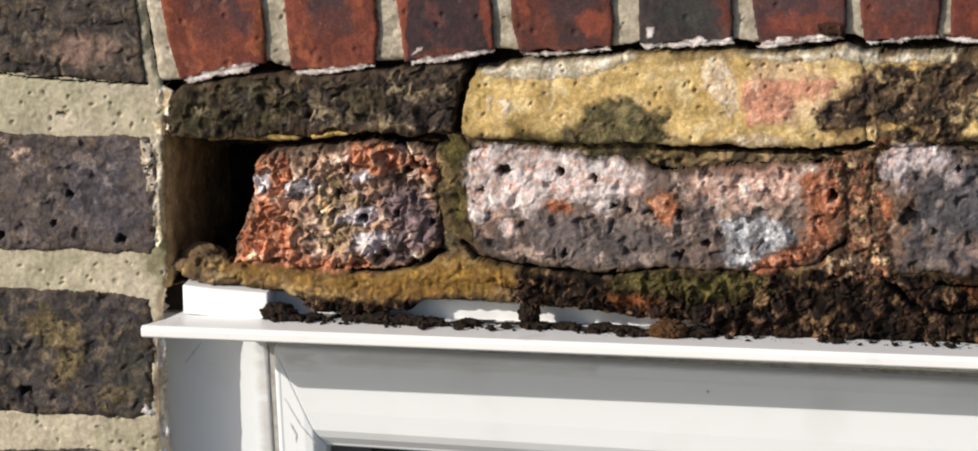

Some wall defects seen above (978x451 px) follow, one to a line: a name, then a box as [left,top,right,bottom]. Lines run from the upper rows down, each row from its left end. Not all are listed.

spalling [299,296,421,315]
spalling [465,142,978,343]